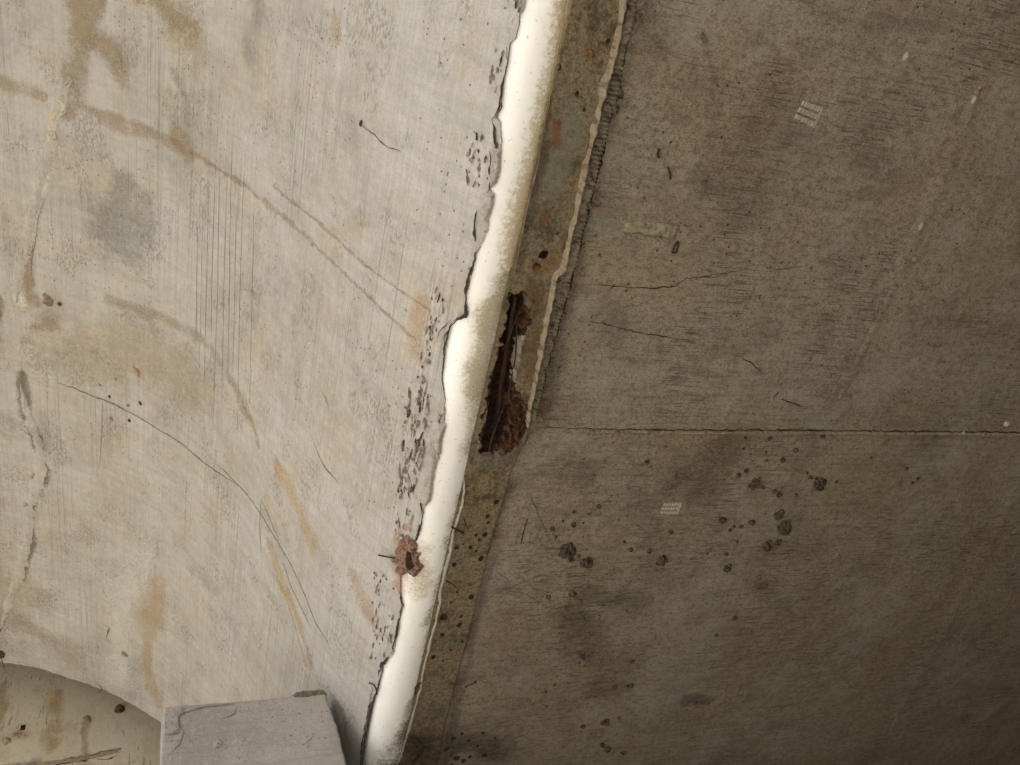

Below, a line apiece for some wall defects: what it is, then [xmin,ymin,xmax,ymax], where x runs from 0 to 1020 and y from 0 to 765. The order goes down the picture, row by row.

crack [26,194,46,293]
peeling [369,47,509,676]
spalling [476,287,538,456]